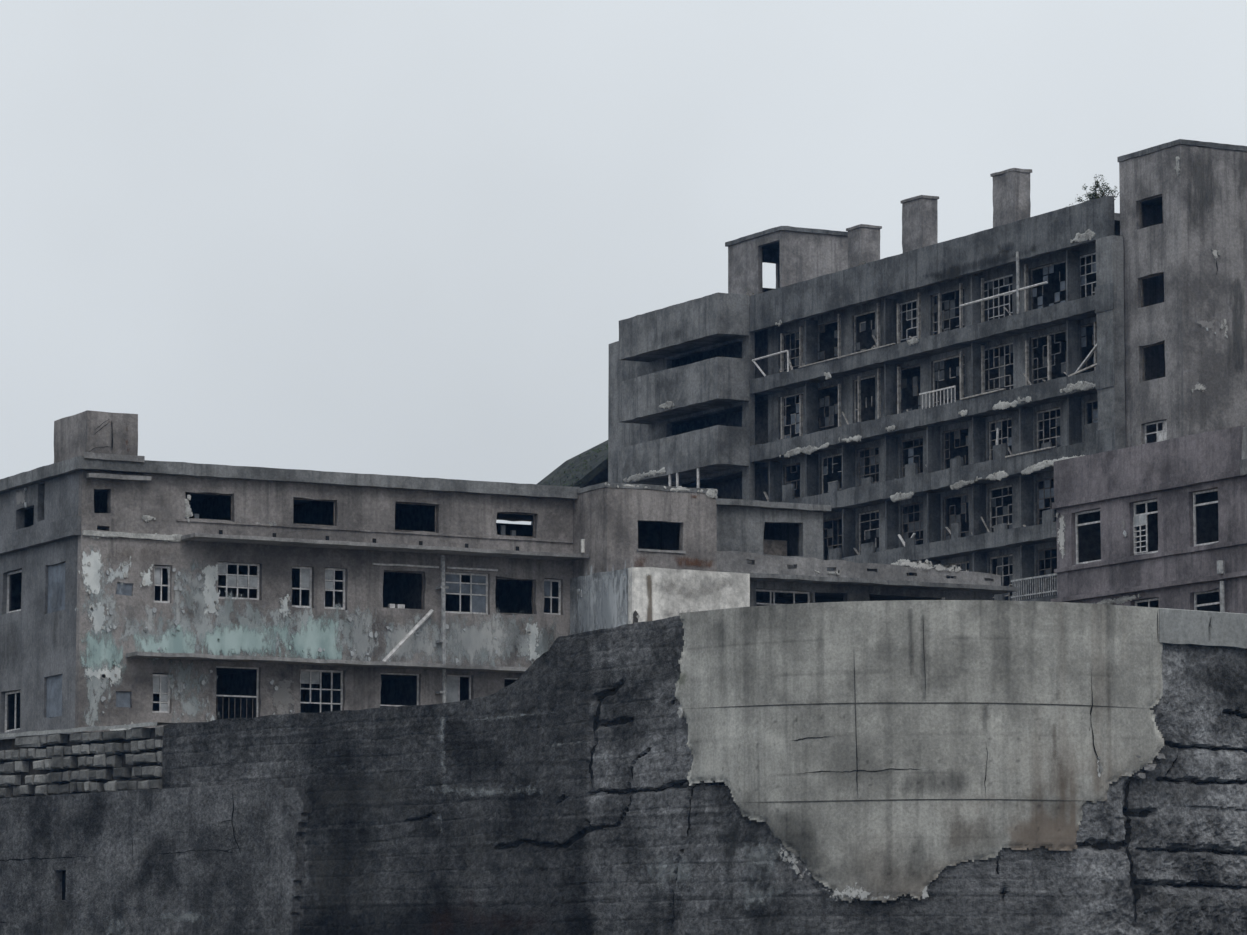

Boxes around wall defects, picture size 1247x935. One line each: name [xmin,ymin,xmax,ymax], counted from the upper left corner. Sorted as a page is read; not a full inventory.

spalling [141,495,193,543]
peeling [75,532,554,731]
peeling [570,563,640,635]
crack [500,683,724,924]
spalling [1136,753,1166,779]
crack [1077,671,1247,923]